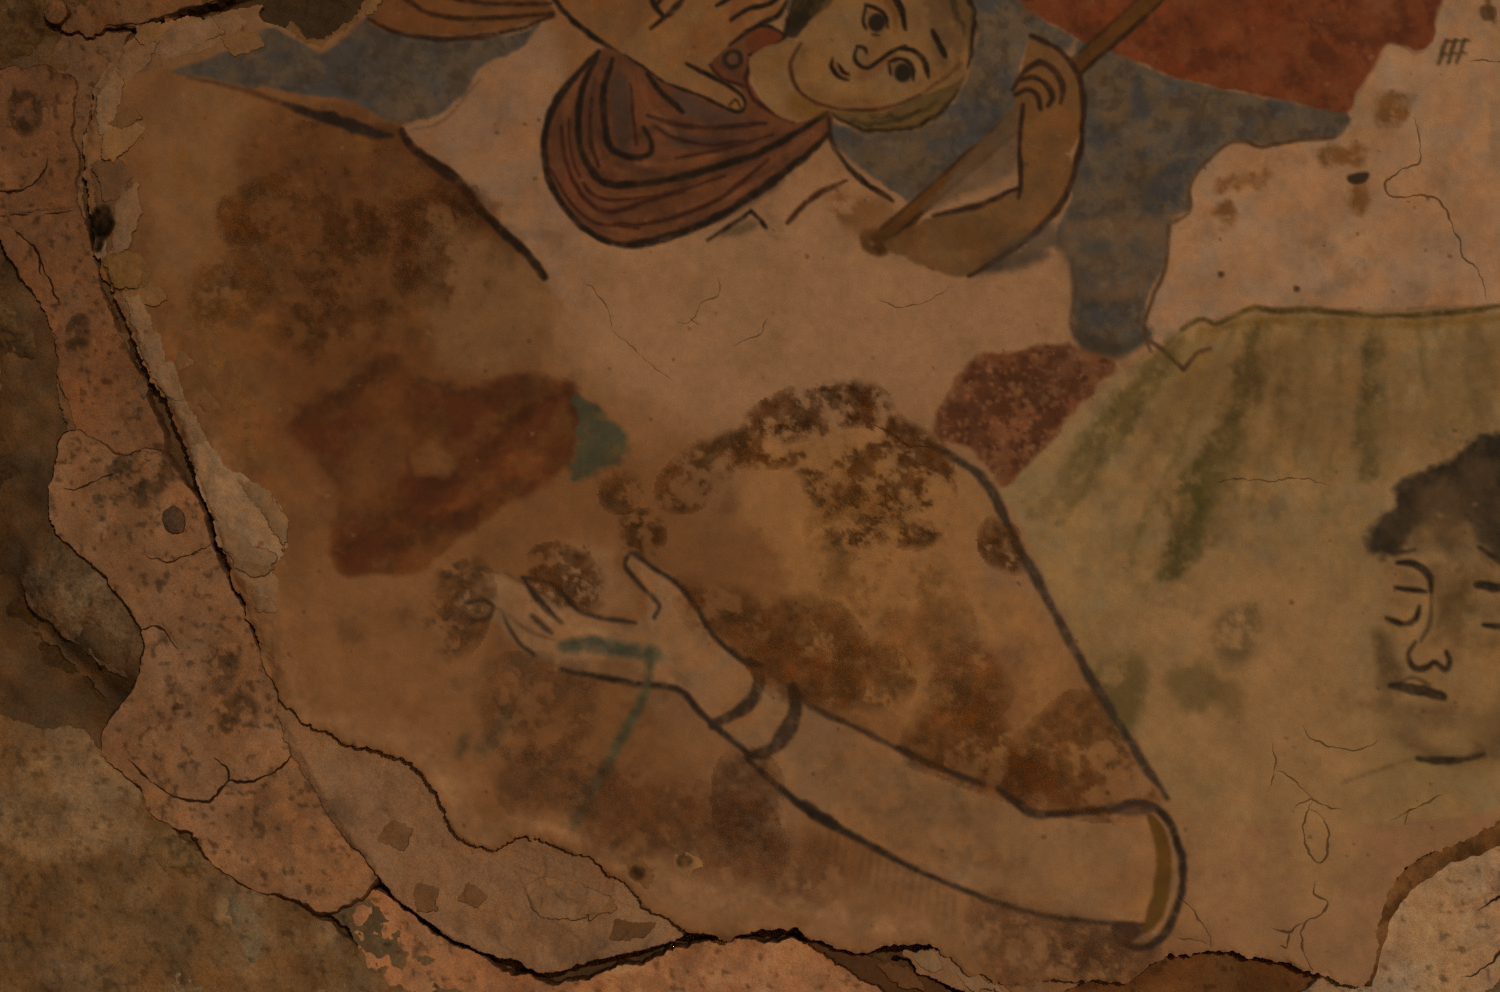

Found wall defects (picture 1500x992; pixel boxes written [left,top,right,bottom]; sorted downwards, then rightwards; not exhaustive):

damp [658,383,951,545]
damp [532,553,590,607]
damp [978,526,1020,571]
spalling [1364,821,1500,986]